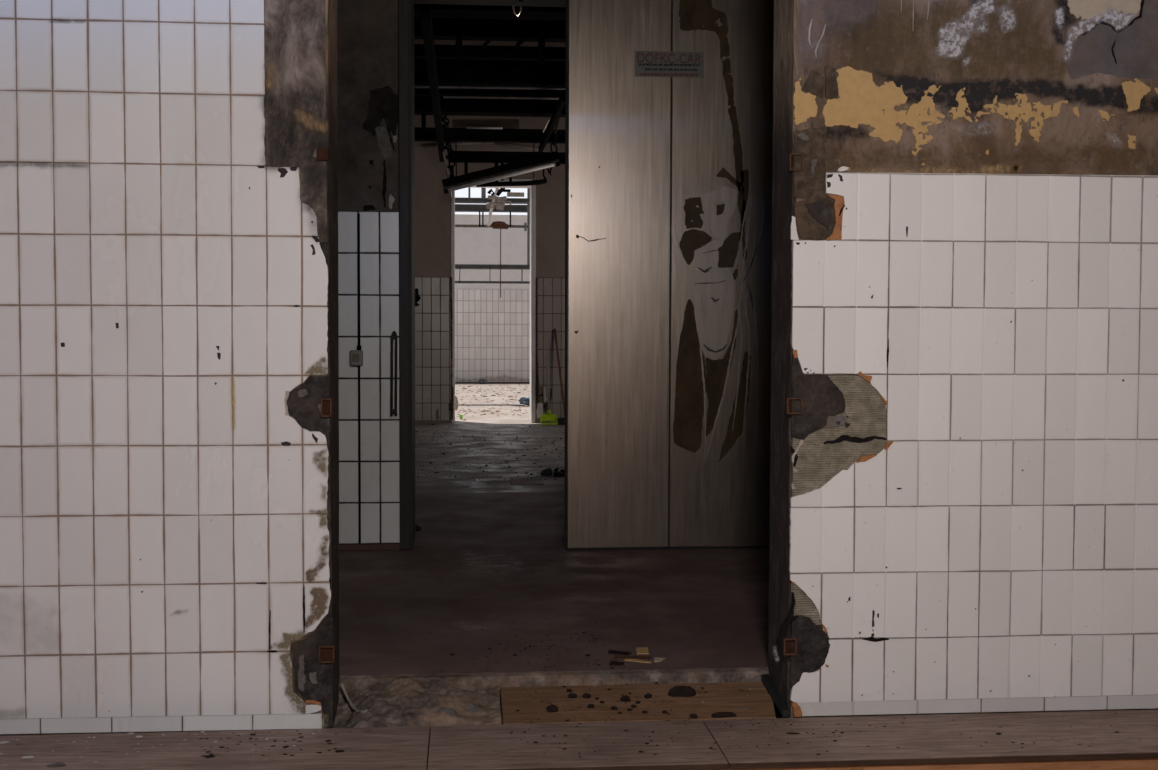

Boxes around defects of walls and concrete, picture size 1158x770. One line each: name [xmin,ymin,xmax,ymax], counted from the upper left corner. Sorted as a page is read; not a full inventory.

leakage [846,0,1158,114]
flaking render [1063,0,1158,121]
flaking render [257,0,329,266]
leakage [826,127,865,139]
peeling [790,19,1080,247]
leakage [837,139,1146,174]
spalling [790,350,893,497]
spalling [284,317,502,730]
spalling [790,581,830,717]